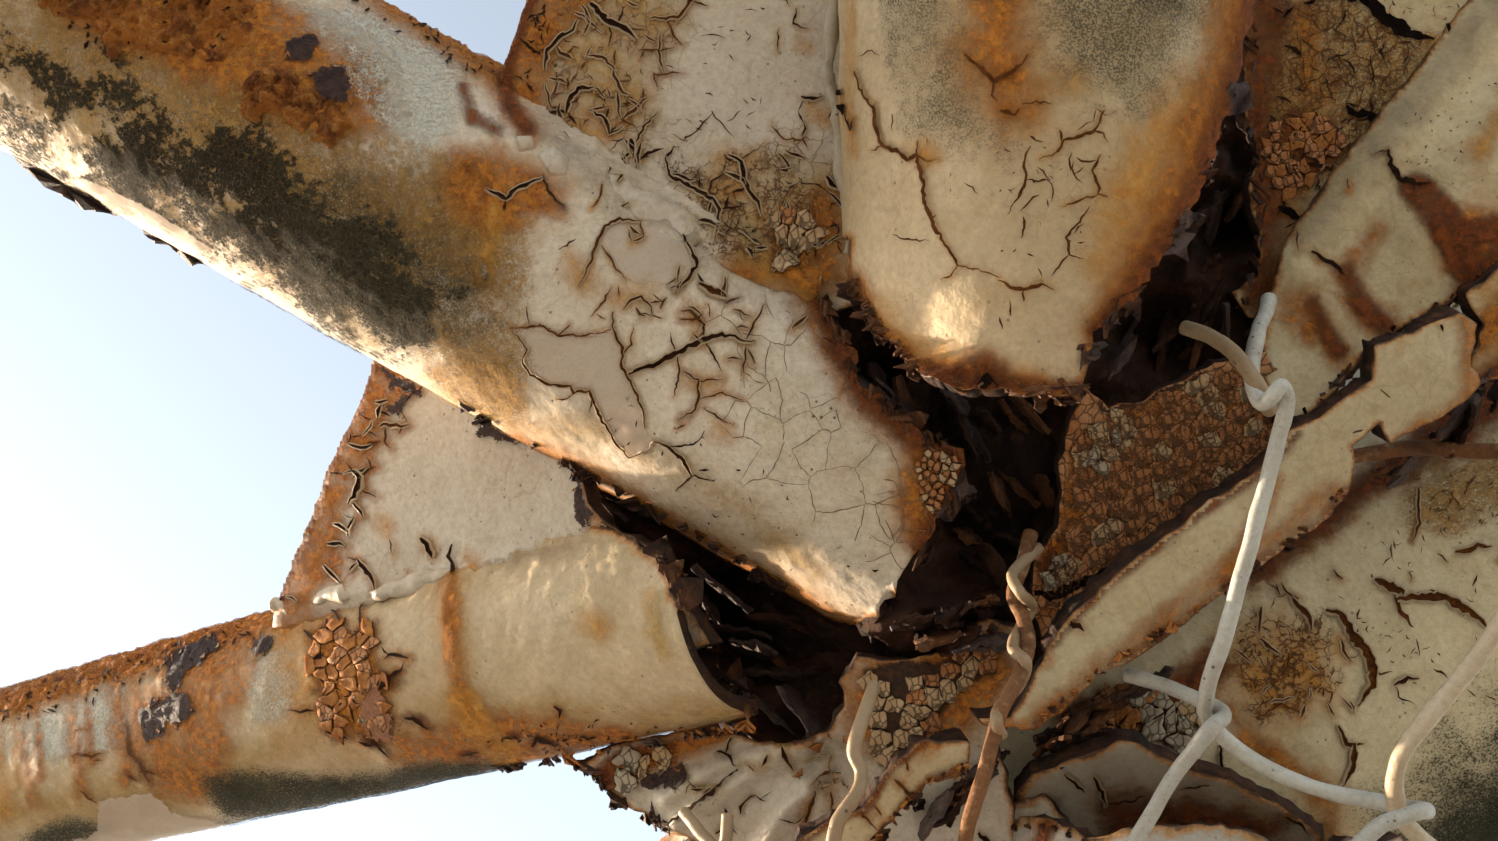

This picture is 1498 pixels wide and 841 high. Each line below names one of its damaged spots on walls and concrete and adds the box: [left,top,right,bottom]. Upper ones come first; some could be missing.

leakage [0,0,538,426]
rust [0,349,551,814]
leakage [279,420,353,599]
crack [279,398,683,758]
peeling [592,741,687,796]
crack [352,0,1108,572]
rust [373,0,1498,775]
spalling [912,748,1010,841]
peeling [856,190,1273,768]
rust [1099,628,1339,841]
crack [1236,459,1498,787]
crack [1261,0,1497,275]